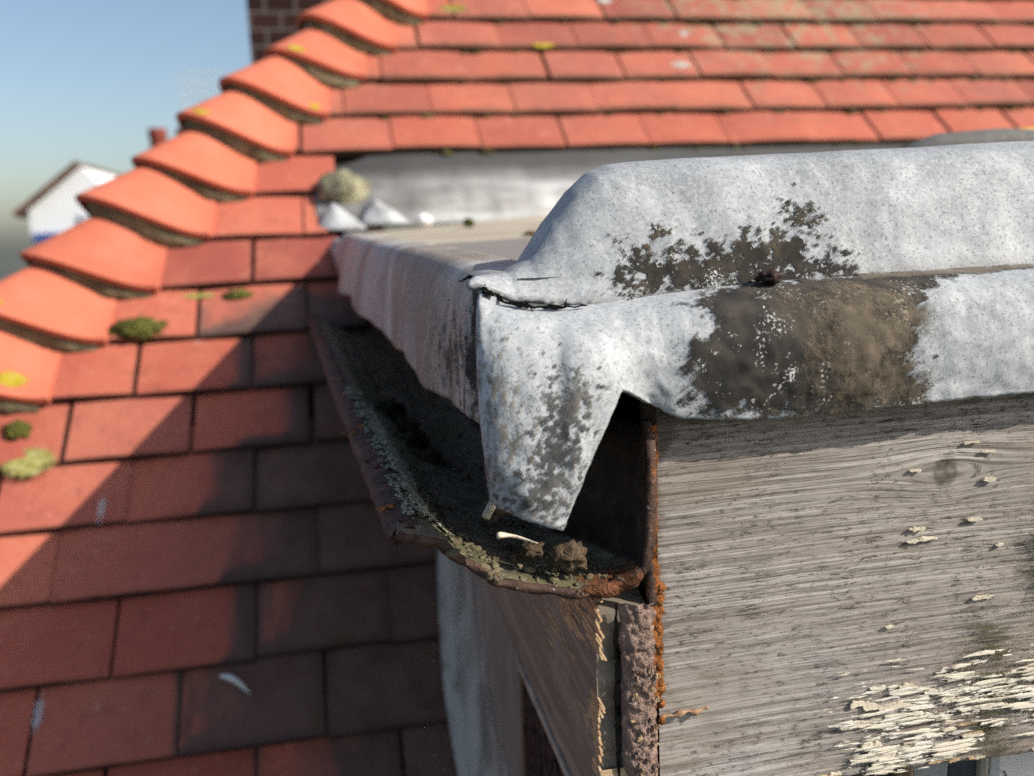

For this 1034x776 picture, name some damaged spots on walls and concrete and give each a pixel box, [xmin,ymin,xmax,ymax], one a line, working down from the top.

crack [458,274,588,312]
water stain [593,182,1034,421]
water stain [426,288,611,530]
spalling [414,535,607,683]
rust [579,493,709,726]
peeling [906,526,938,544]
peeling [578,688,606,776]
peeling [618,602,661,776]
peeling [820,642,1034,776]